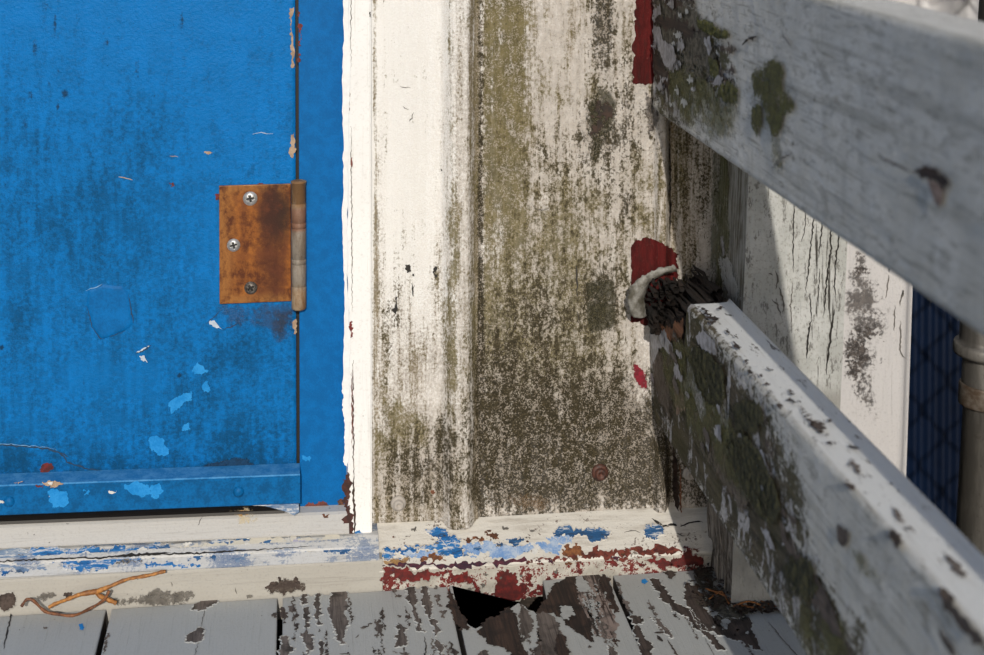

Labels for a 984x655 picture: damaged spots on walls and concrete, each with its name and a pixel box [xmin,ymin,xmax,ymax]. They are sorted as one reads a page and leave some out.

peeling [0,0,361,576]
leakage [586,280,616,333]
crack [769,208,840,374]
leakage [846,252,884,404]
crack [886,271,905,358]
peeling [745,350,866,498]
peeling [381,524,612,561]
peeling [264,575,459,655]
peeling [559,605,575,620]
peeling [616,581,675,655]
peeling [647,567,765,652]
peeling [936,587,984,647]